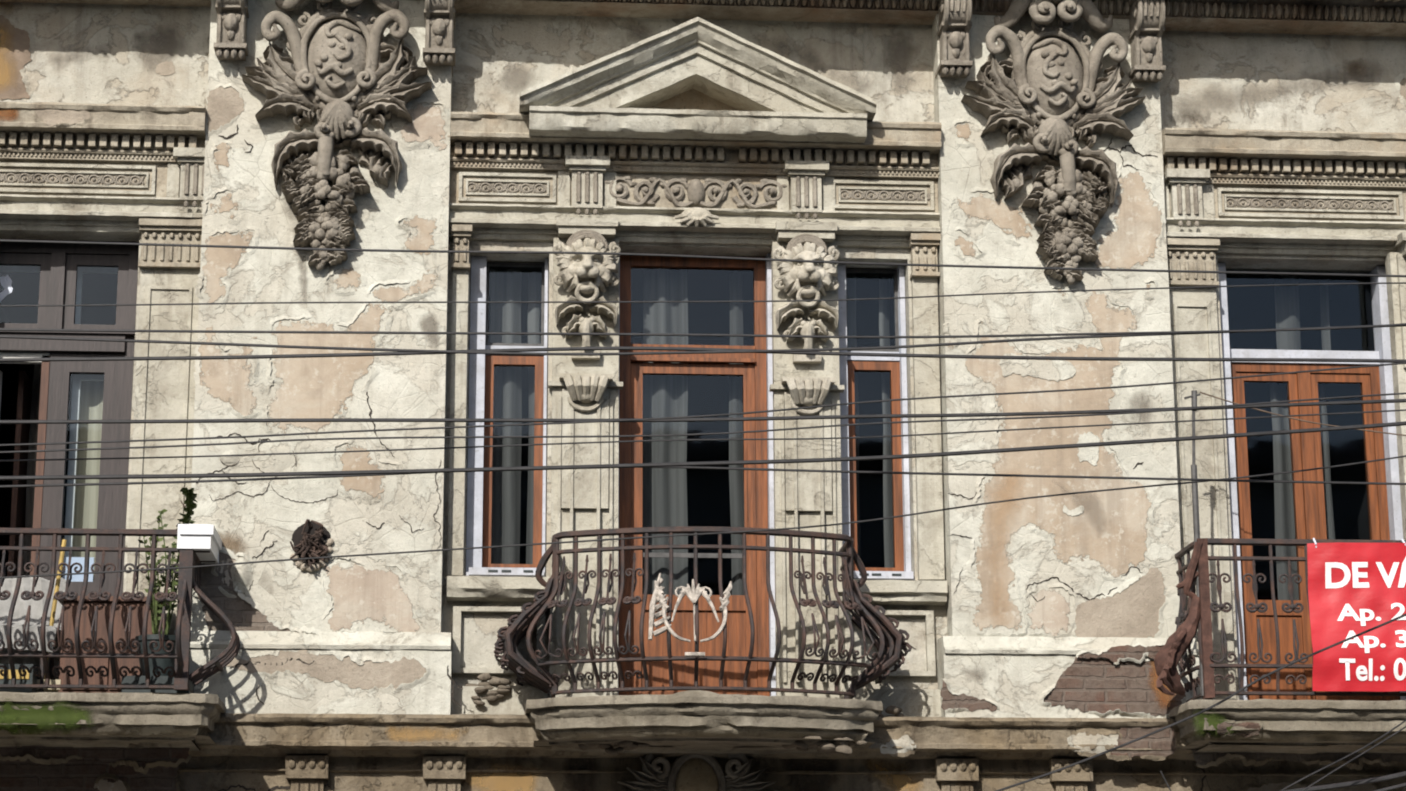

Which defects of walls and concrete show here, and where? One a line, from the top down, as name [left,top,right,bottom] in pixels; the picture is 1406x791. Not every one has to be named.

flaking render [0,10,94,135]
peeling [195,82,261,309]
crack [198,433,297,501]
peeling [194,213,448,506]
crack [366,392,394,457]
crack [366,459,441,549]
peeling [940,164,1406,791]
flaking render [195,519,431,695]